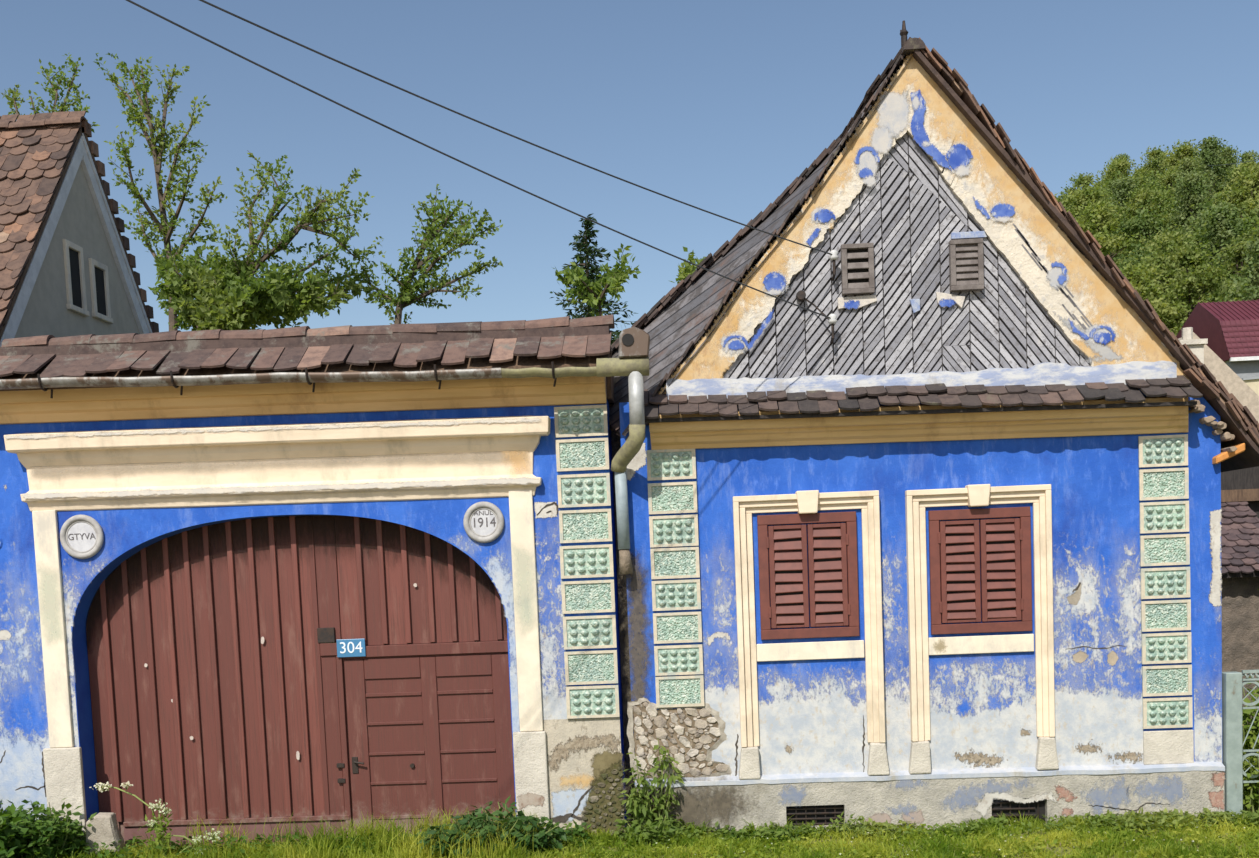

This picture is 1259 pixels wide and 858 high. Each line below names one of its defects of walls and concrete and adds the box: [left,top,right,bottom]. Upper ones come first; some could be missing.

peeling [951,231,987,240]
spalling [534,501,558,518]
peeling [0,584,50,820]
flaking render [517,534,624,830]
peeling [702,554,741,776]
peeling [758,665,870,806]
peeling [864,555,924,827]
peeling [929,547,1187,818]